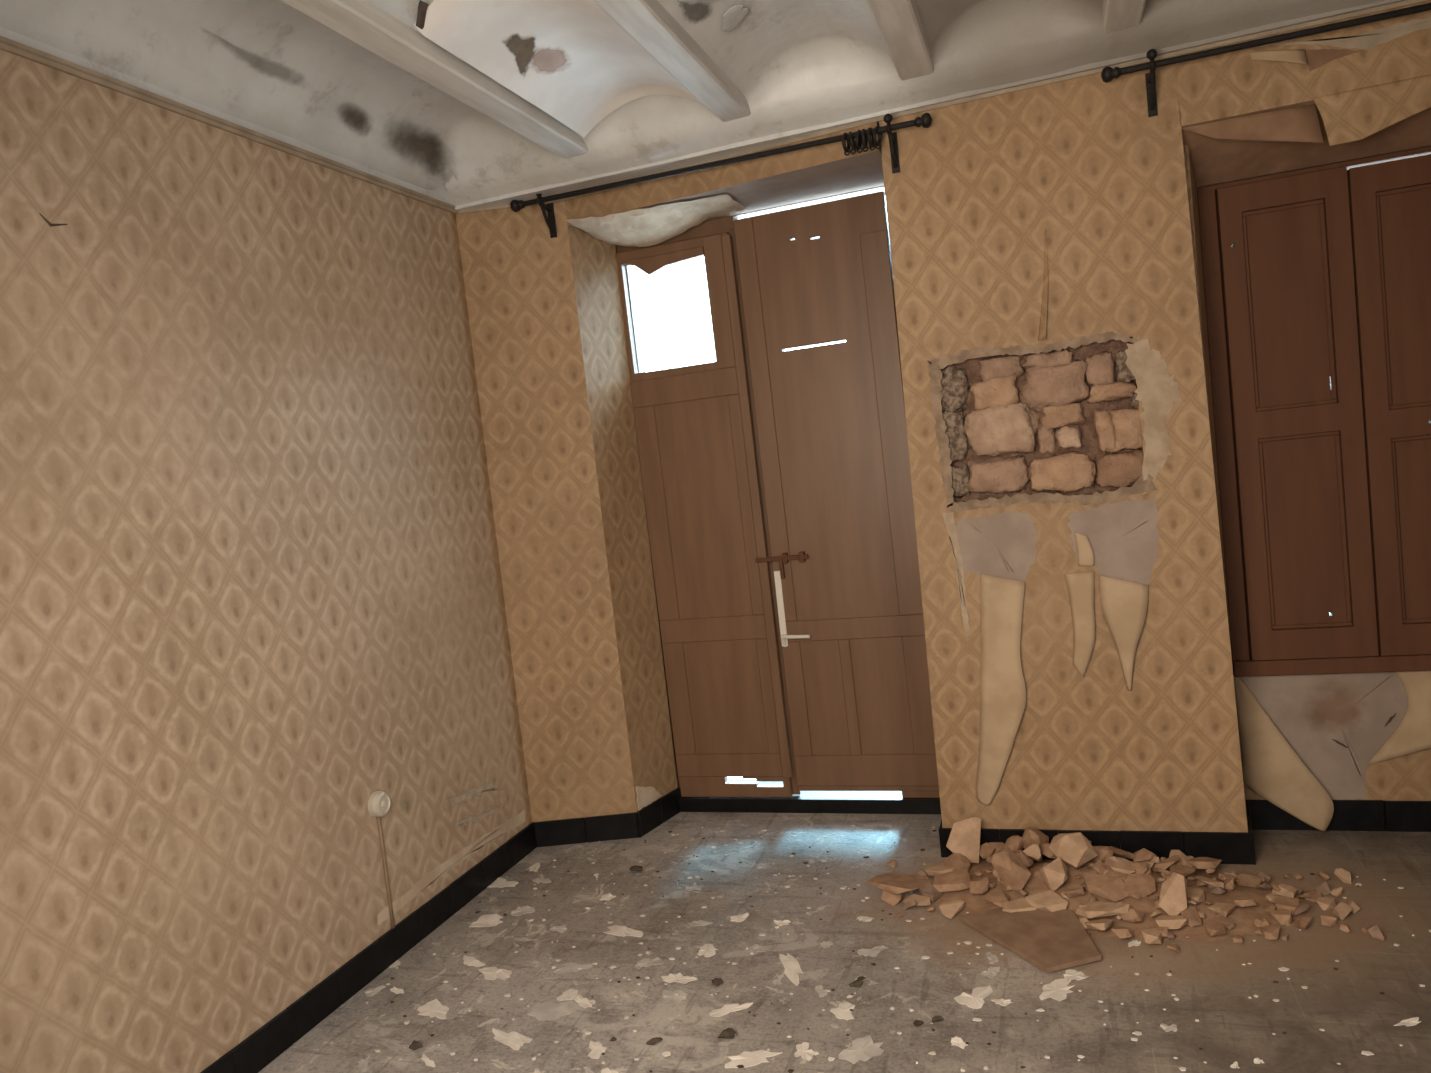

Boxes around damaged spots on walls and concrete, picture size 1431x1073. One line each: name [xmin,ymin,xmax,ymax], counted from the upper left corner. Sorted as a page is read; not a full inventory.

peeling [1258,17,1431,71]
damp [343,108,366,129]
damp [394,131,444,173]
flaking render [927,331,1181,585]
flaking render [1239,672,1408,800]